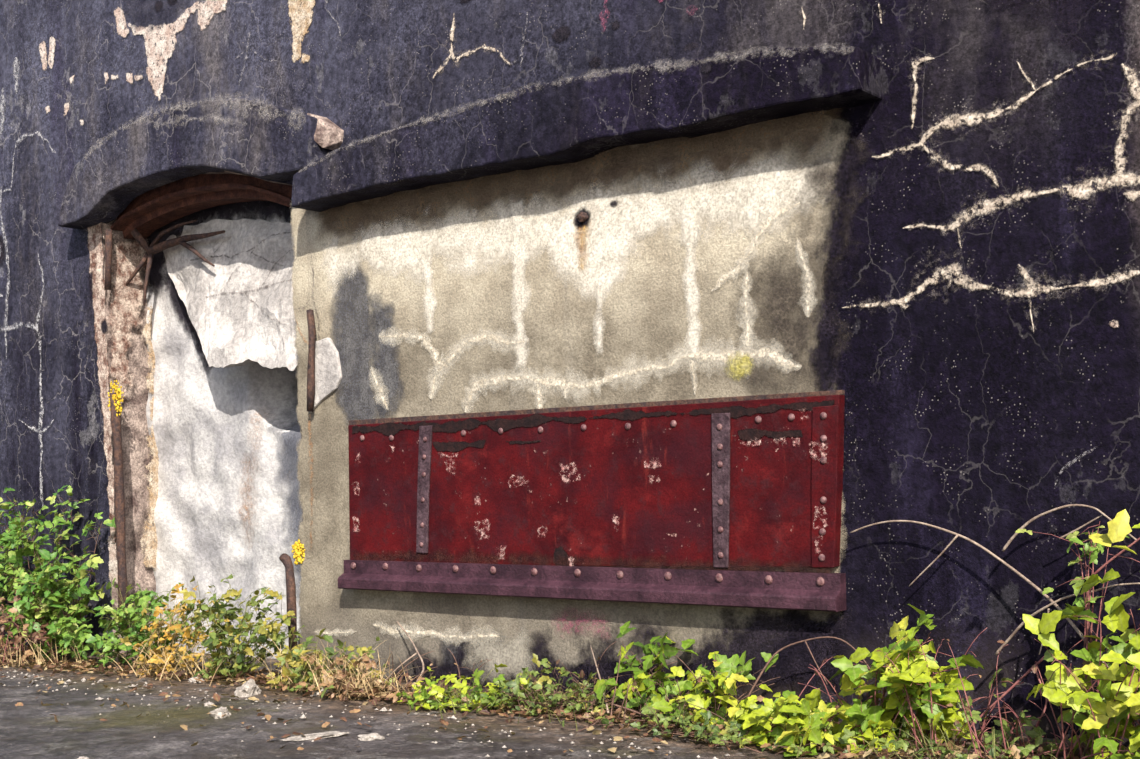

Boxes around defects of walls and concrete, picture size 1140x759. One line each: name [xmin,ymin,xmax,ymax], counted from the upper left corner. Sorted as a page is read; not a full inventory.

peeling [104,0,227,101]
peeling [288,0,315,63]
crack [433,18,510,78]
crack [842,53,1140,332]
leakage [315,108,857,421]
crack [0,131,56,507]
corrosion [352,400,835,436]
corrosion [354,550,828,573]